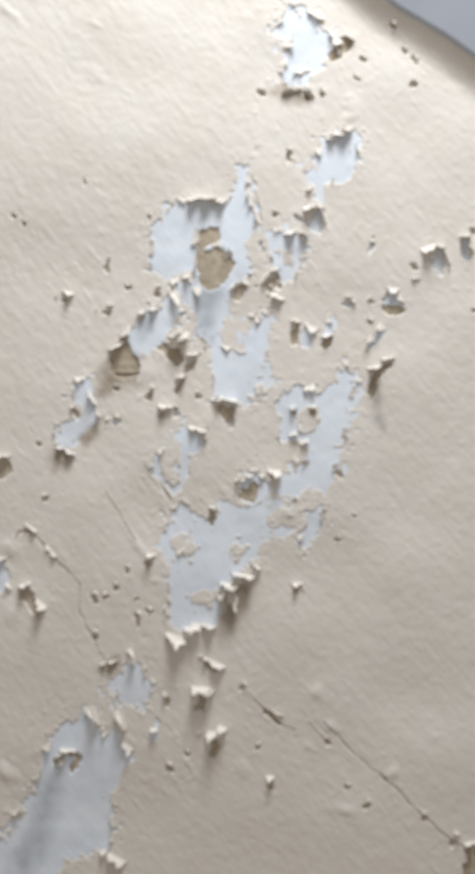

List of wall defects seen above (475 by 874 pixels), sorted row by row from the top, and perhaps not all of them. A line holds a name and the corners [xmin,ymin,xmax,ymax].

peeling [267,0,356,101]
peeling [364,286,405,349]
peeling [420,244,451,276]
peeling [51,369,121,459]
peeling [108,126,395,651]
crack [15,524,106,661]
peeling [0,648,170,874]
crack [253,699,467,848]